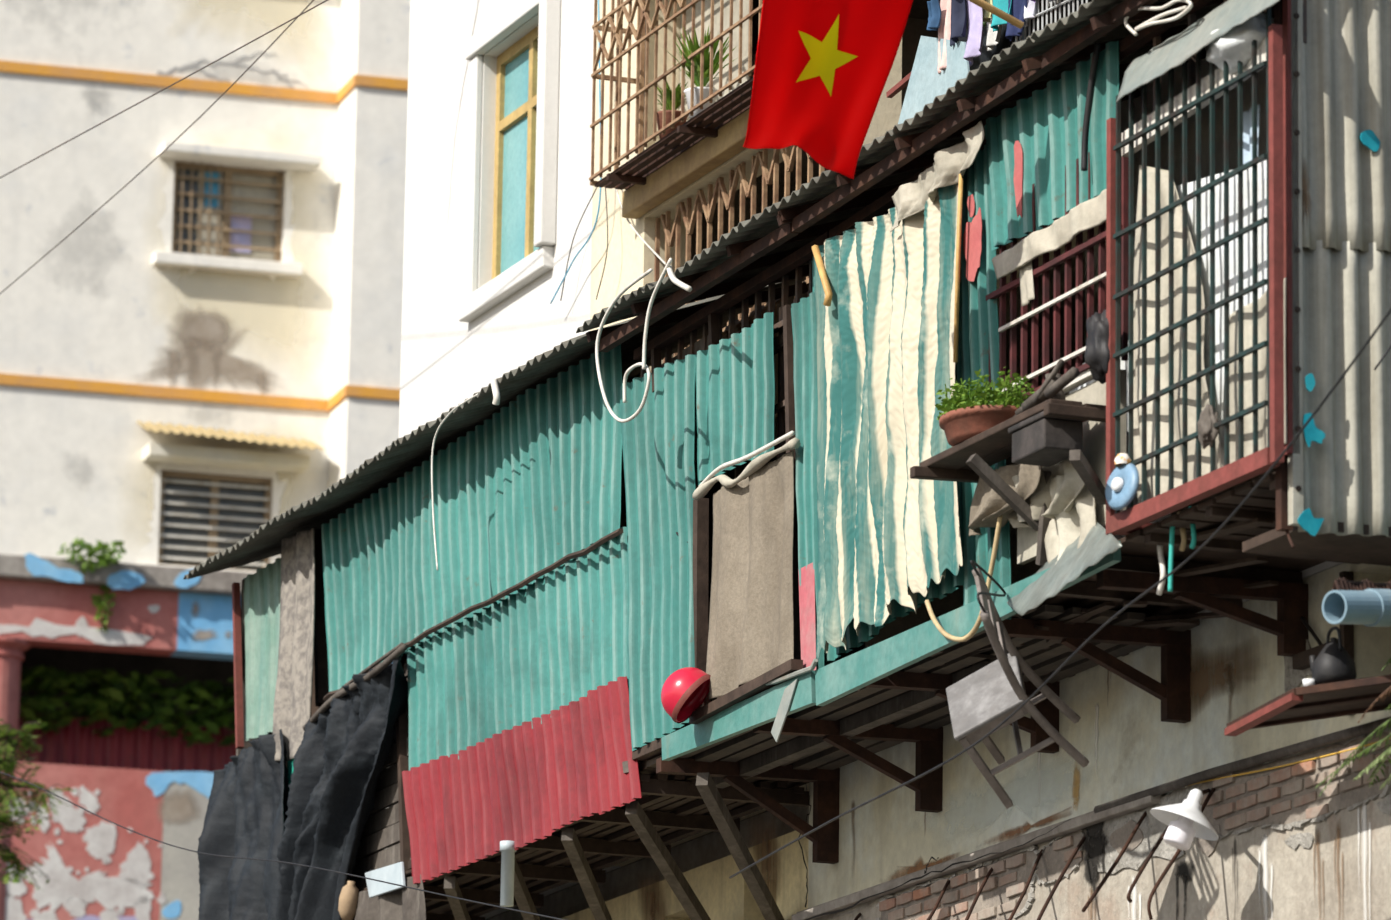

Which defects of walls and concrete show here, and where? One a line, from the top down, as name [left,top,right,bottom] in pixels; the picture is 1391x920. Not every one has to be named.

crack [157,51,309,89]
water stain [156,314,267,388]
peeling [0,616,153,645]
peeling [146,771,214,798]
peeling [5,785,181,920]
water stain [1082,822,1107,920]
flaking render [875,727,1391,920]
water stain [1128,878,1141,920]
water stain [1176,863,1193,920]
water stain [1258,838,1273,918]
water stain [1314,805,1371,920]